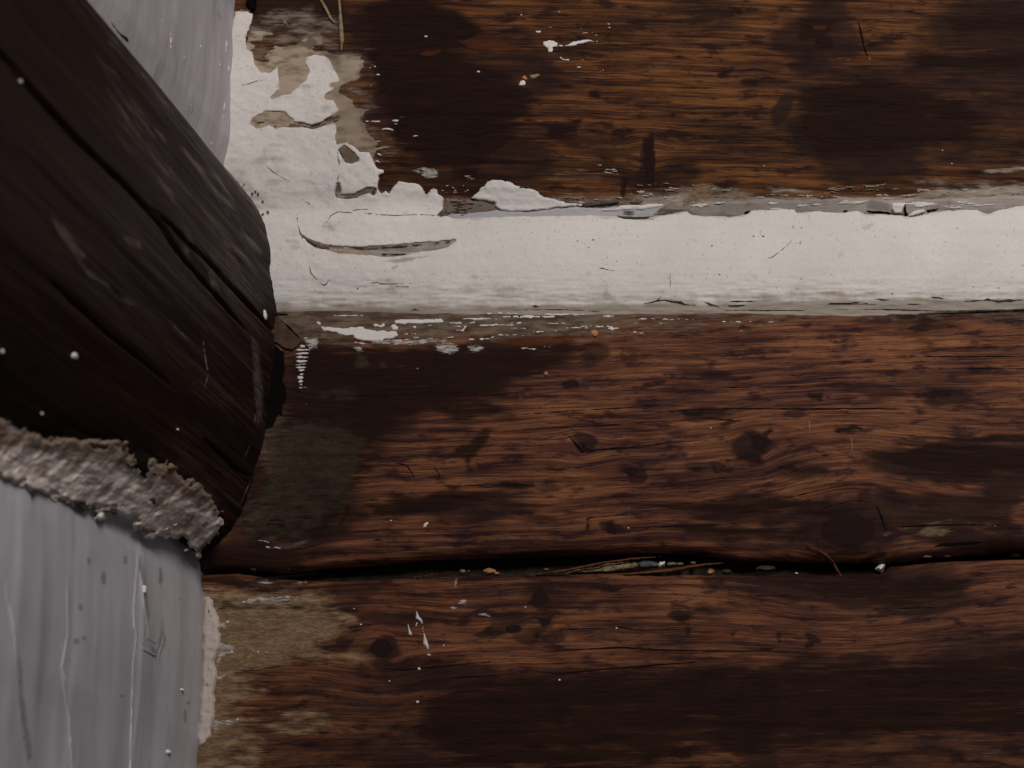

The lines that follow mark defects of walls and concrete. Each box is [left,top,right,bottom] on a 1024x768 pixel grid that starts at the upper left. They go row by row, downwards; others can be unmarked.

peeling [536,27,597,68]
peeling [246,31,401,164]
leakage [366,0,538,176]
peeling [414,167,679,218]
leakage [638,184,757,211]
peeling [687,183,1024,217]
leakage [861,185,1024,200]
peeling [297,217,456,268]
peeling [316,312,618,350]
leakage [251,339,263,423]
leakage [266,338,579,535]
leakage [417,652,1024,768]